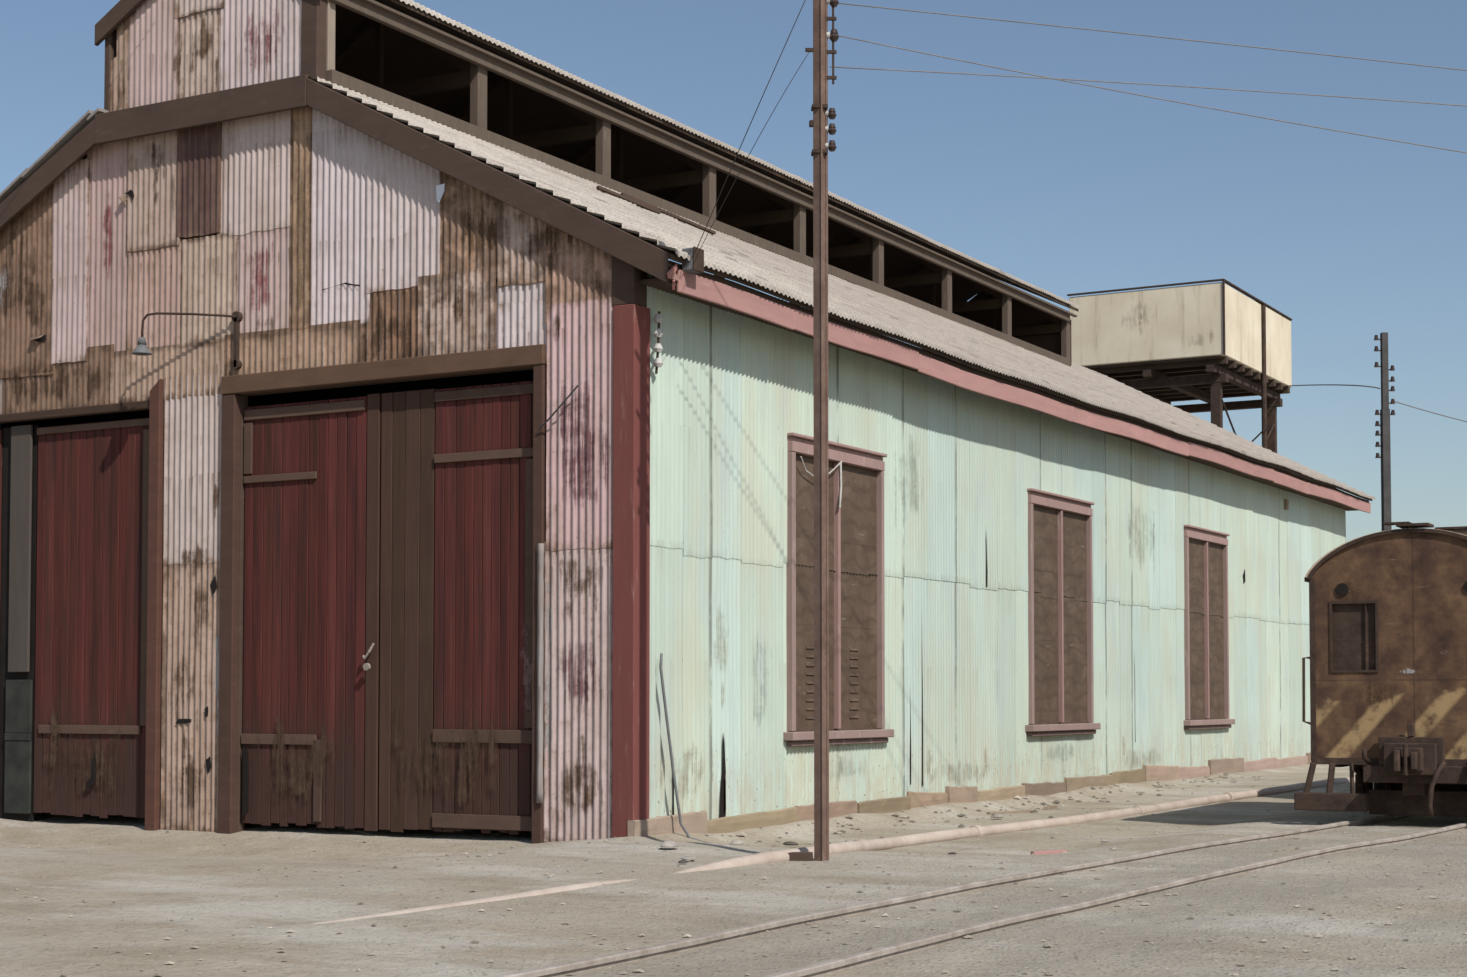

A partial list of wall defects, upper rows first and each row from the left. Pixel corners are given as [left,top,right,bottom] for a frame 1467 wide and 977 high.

corrosion [2,234,45,326]
corrosion [462,208,495,258]
corrosion [529,228,573,276]
corrosion [363,290,474,359]
corrosion [4,360,100,404]
corrosion [182,545,207,644]
corrosion [175,660,194,719]
corrosion [179,727,201,811]
corrosion [564,735,602,811]
crack [719,736,727,818]